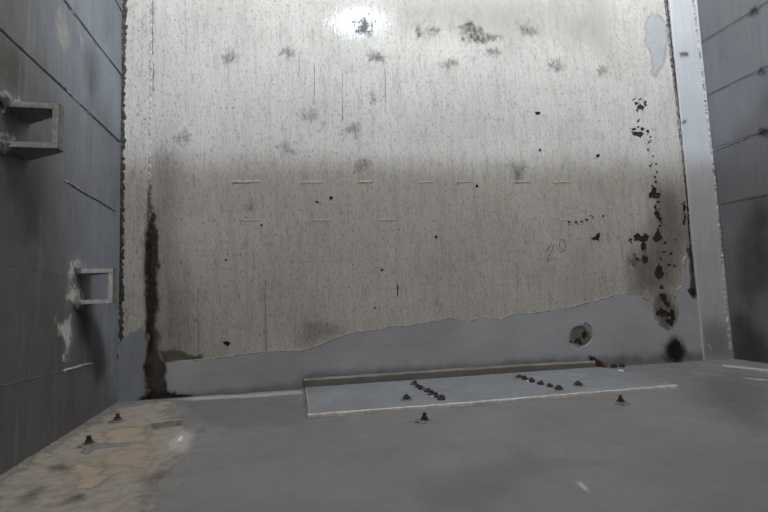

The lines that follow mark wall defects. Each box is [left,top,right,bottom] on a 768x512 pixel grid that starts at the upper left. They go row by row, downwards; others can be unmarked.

leakage [461,22,495,43]
leakage [140,185,193,400]
peeling [164,98,703,399]